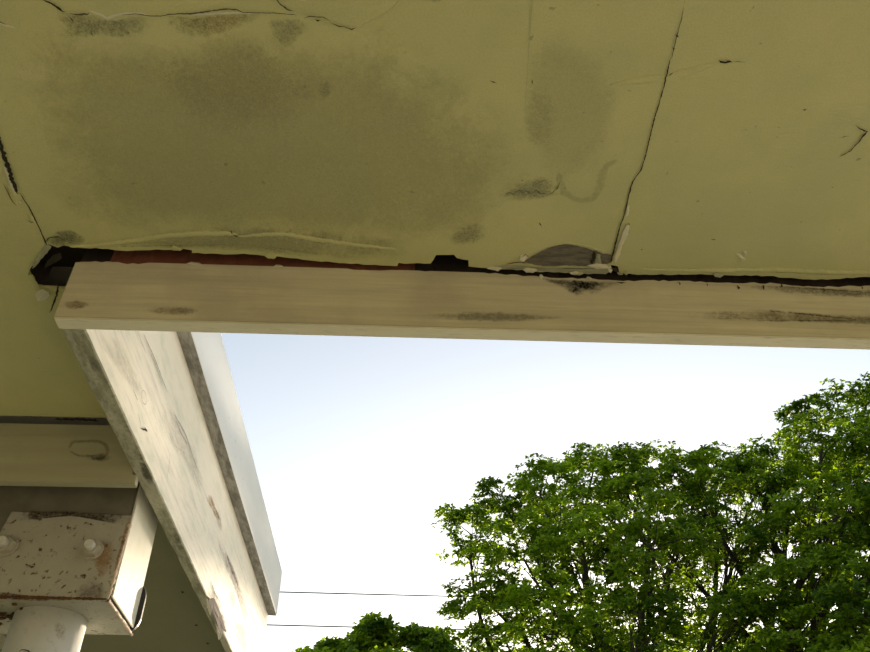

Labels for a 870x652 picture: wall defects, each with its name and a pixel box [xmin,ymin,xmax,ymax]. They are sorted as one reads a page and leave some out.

crack [44,0,295,36]
crack [611,8,684,263]
crack [0,137,47,245]
rust [29,512,114,521]
rust [0,593,49,626]